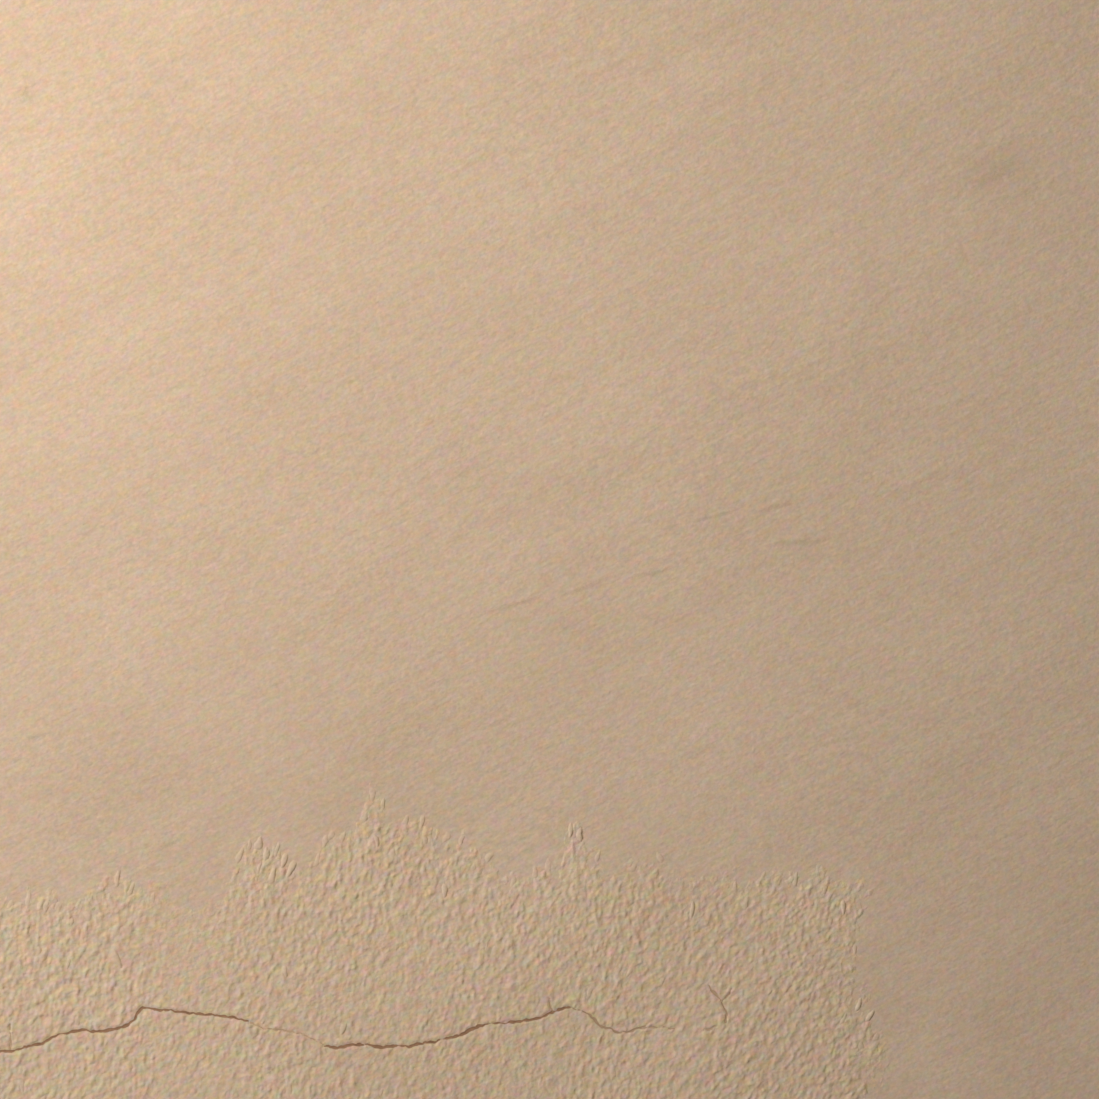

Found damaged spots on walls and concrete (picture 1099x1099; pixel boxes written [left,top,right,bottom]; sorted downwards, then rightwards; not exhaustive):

spalling [0,782,894,1099]
crack [0,1002,675,1053]
crack [706,985,732,1031]